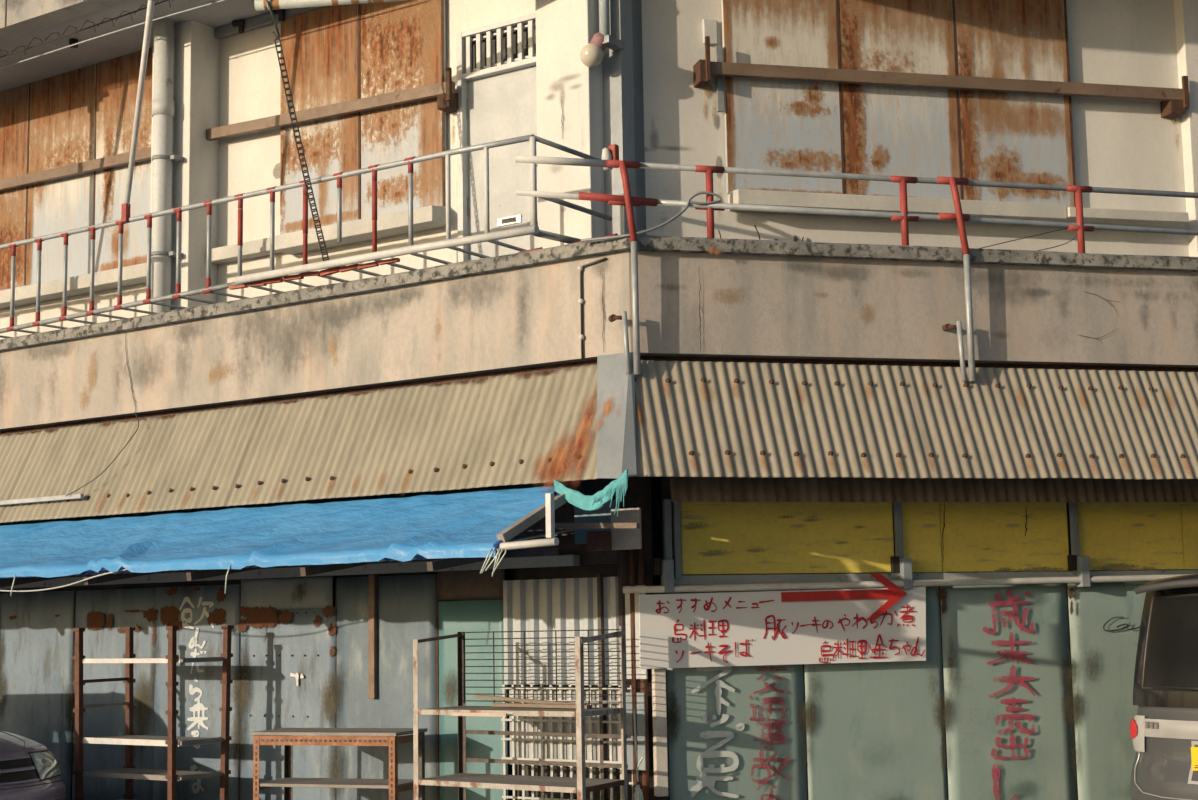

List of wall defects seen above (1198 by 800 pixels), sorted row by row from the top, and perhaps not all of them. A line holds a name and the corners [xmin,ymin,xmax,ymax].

rust [0,47,153,290]
rust [280,0,453,232]
rust [704,0,1074,205]
rust [538,401,611,484]
damp [935,644,955,730]